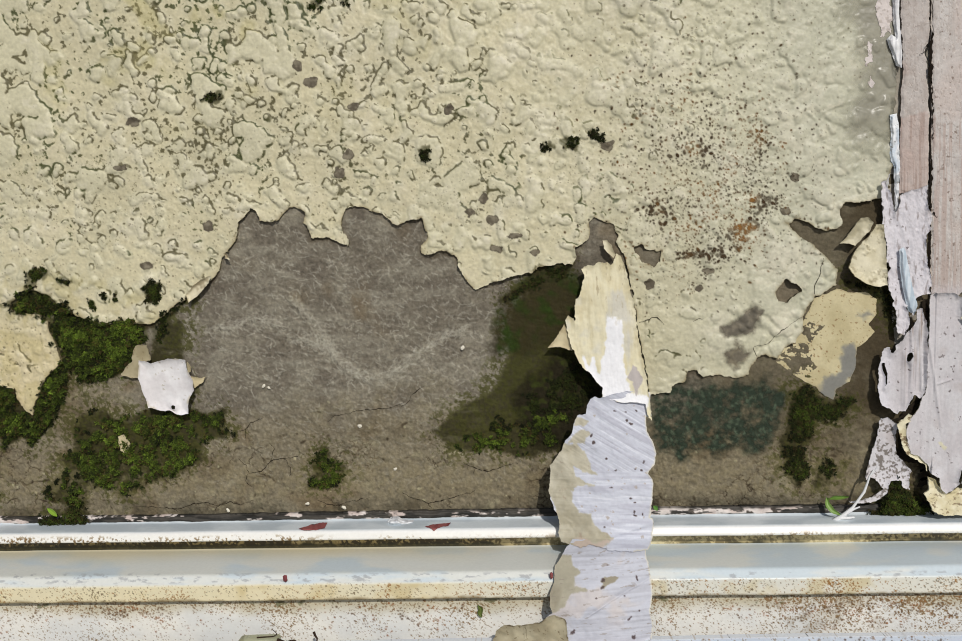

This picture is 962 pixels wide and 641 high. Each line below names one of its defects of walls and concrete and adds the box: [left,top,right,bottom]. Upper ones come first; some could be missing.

rust [589,63,813,294]
peeling [0,174,940,641]
rust [766,594,956,641]